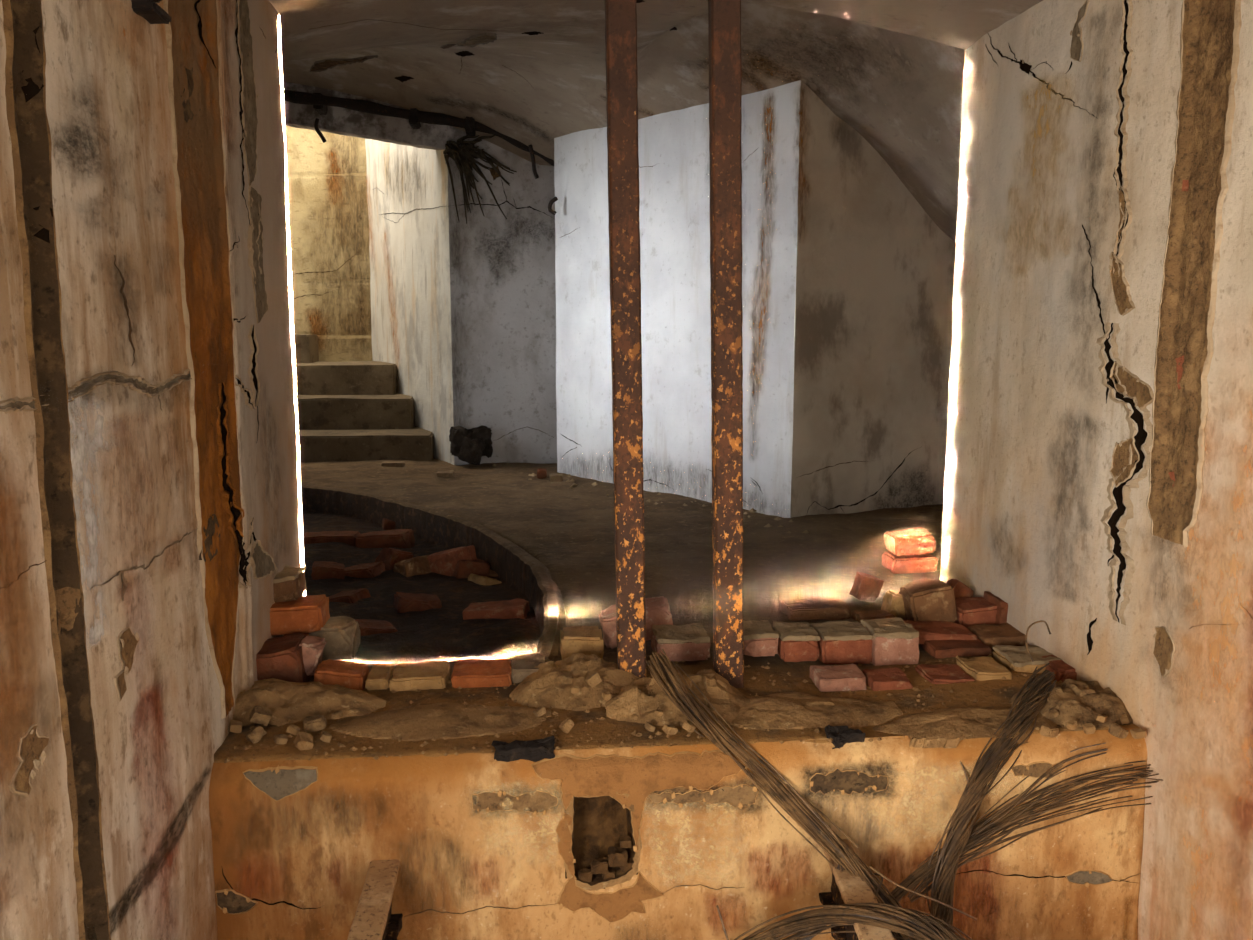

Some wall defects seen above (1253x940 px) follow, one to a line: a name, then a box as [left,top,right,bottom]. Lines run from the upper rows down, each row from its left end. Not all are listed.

rust [744,56,809,427]
spalling [1109,0,1242,547]
crack [986,0,1153,655]
crack [0,255,260,589]
crack [797,449,916,515]
crack [90,528,198,601]
spalling [8,723,49,797]
spalling [809,767,888,795]
spalling [471,749,760,923]
spalling [215,889,258,914]
crack [956,870,1141,883]